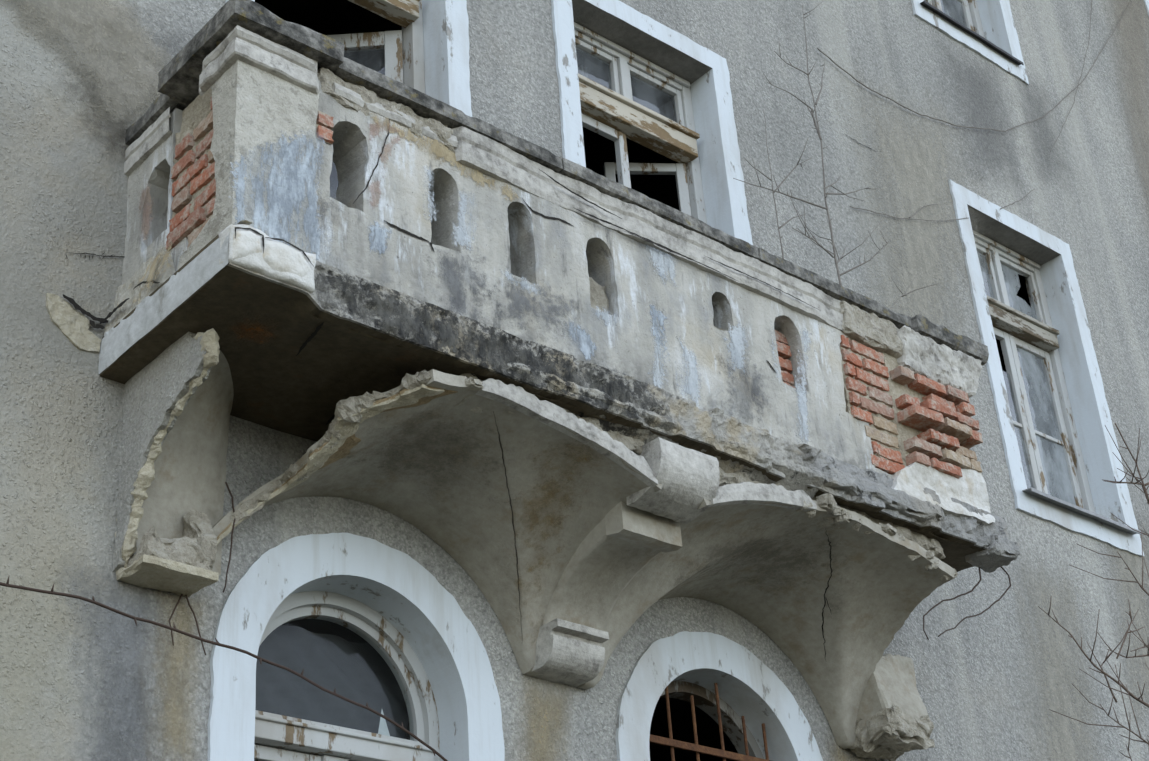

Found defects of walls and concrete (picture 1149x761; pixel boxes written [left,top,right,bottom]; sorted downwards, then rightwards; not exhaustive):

flaking render [140,97,216,291]
crack [353,119,390,204]
crack [384,220,434,251]
flaking render [46,293,108,353]
spalling [115,328,220,568]
peeling [566,323,597,360]
flaking render [772,329,811,441]
flaking render [839,335,983,479]
crack [493,411,522,631]
crack [822,528,832,660]